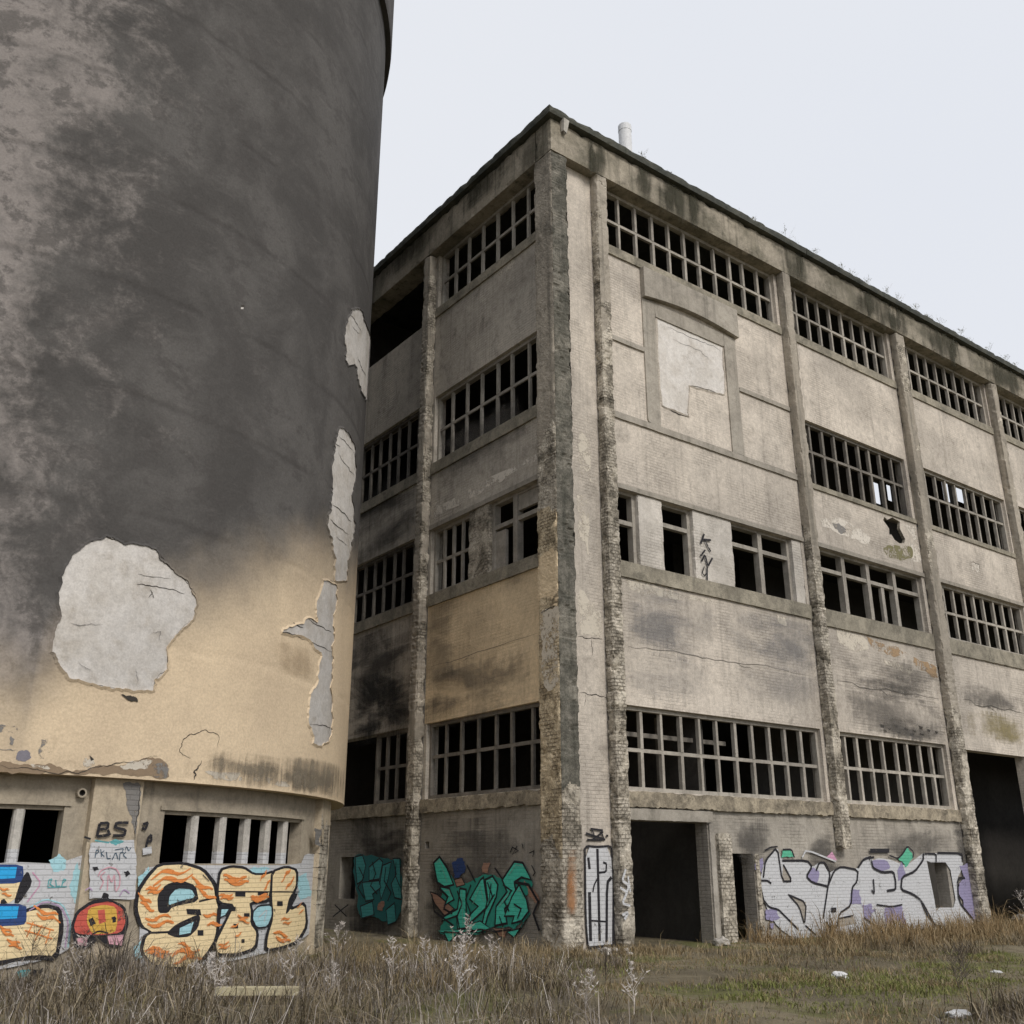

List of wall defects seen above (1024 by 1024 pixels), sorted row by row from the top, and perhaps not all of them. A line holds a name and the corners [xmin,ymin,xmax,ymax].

water stain [589,143,605,175]
water stain [638,166,699,221]
flaking render [343,307,371,402]
flaking render [655,315,726,417]
spalling [821,508,922,563]
flaking render [281,426,357,748]
flaking render [49,534,199,702]
crack [629,646,809,676]
spalling [0,724,169,833]
crack [179,730,219,779]
water stain [237,763,278,783]
water stain [293,758,344,791]